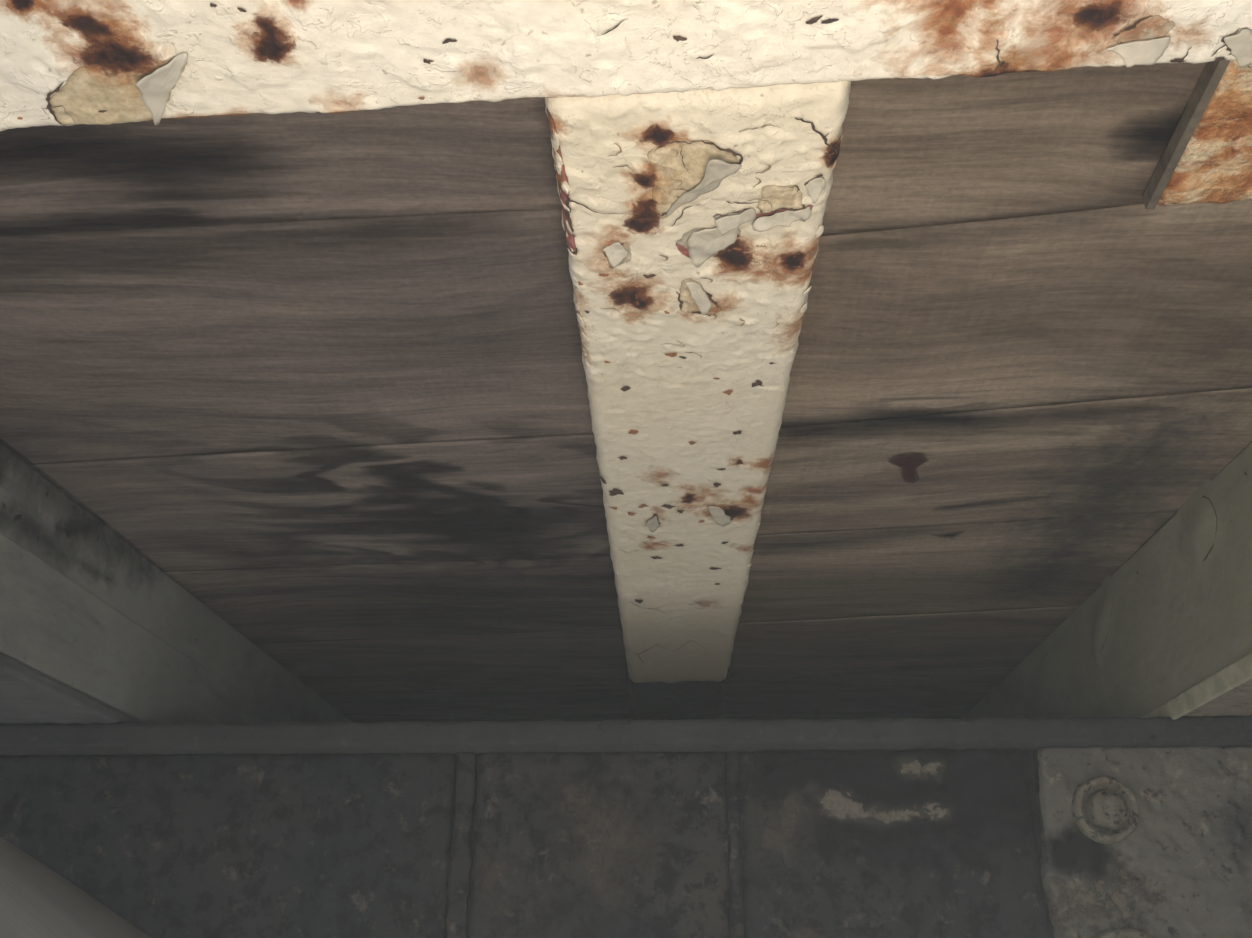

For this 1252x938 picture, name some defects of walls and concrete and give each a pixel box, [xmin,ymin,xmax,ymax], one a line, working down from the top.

corrosion [1,0,157,85]
corrosion [249,17,296,63]
peeling [1107,15,1185,67]
peeling [46,52,188,126]
damp [0,215,193,237]
damp [0,130,256,200]
corrosion [602,162,662,253]
peeling [647,138,743,219]
peeling [664,174,826,316]
corrosion [715,236,820,284]
corrosion [609,274,663,322]
damp [245,445,584,560]